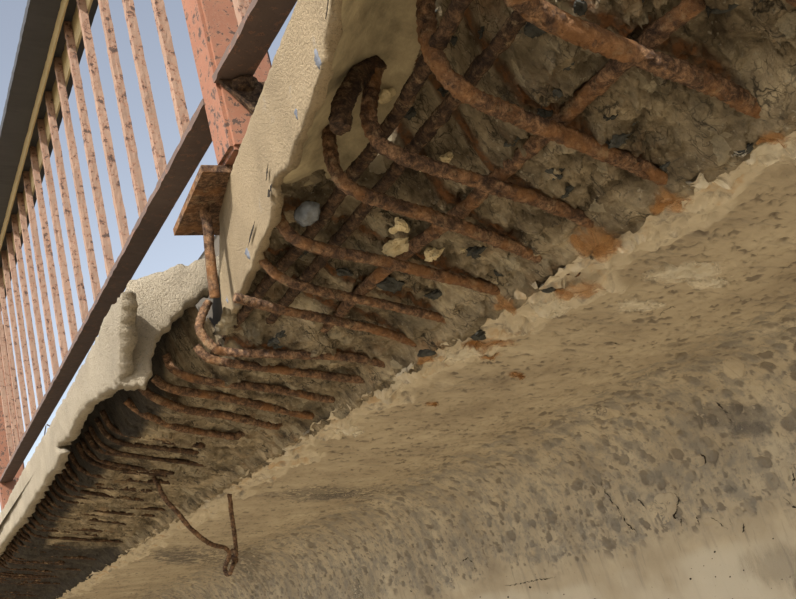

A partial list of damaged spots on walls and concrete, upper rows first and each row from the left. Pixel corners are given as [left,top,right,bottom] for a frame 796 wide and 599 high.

spalling [281,0,796,312]
corrosion [757,133,785,148]
corrosion [465,340,511,361]
spalling [0,208,505,599]
flaking render [645,492,678,524]